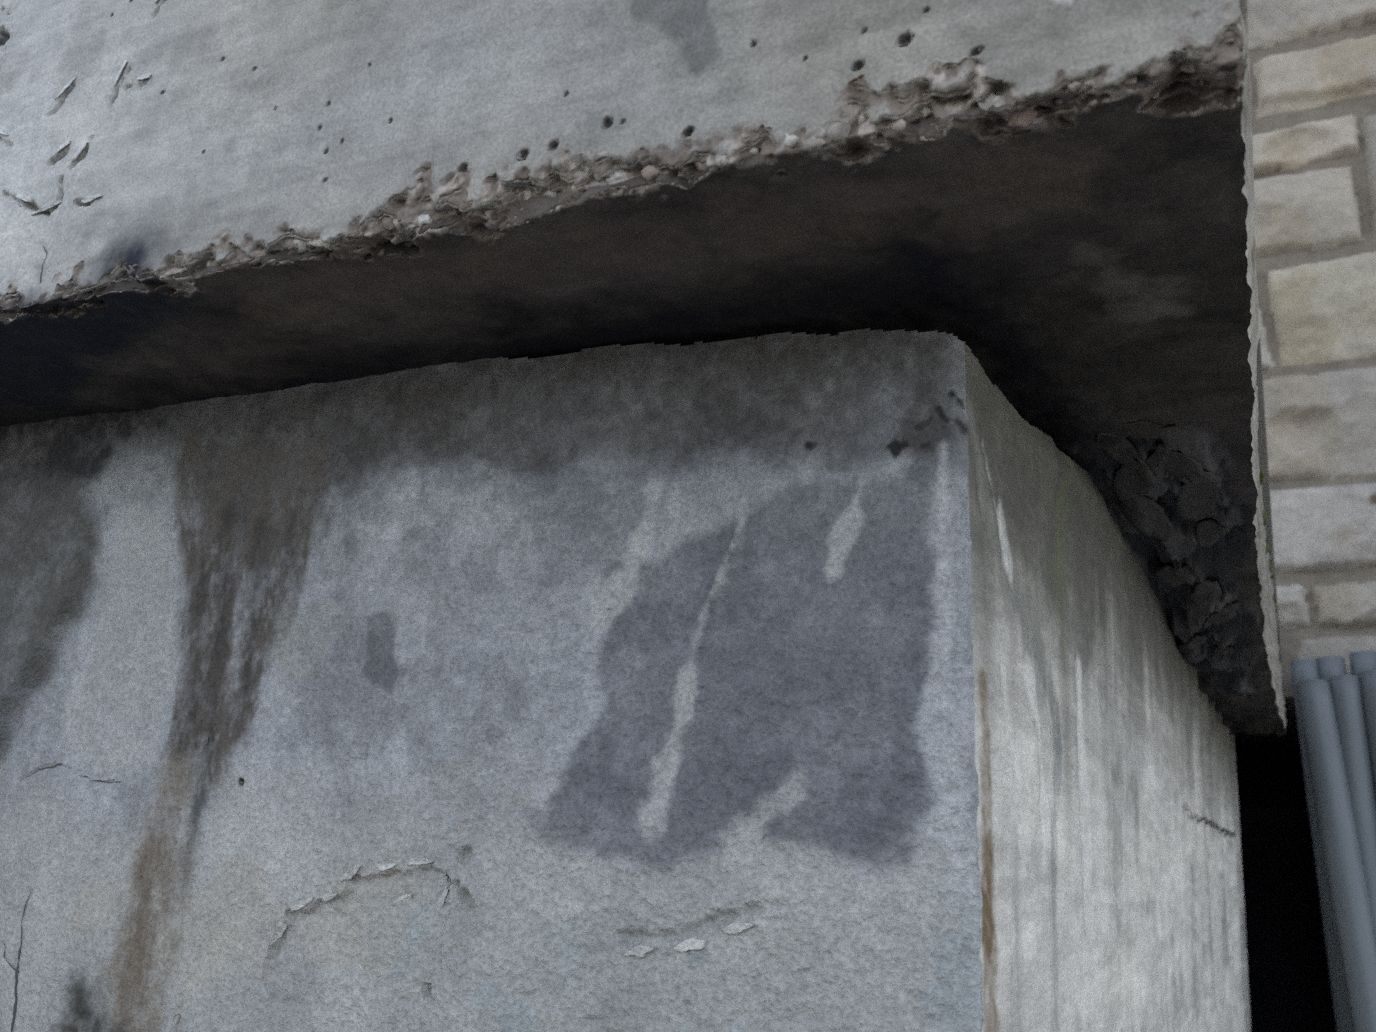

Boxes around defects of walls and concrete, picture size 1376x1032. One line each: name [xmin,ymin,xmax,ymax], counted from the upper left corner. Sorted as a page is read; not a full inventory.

spalling [0,0,1245,324]
leakage [626,0,729,86]
leakage [0,129,1230,1032]
spalling [1055,422,1264,699]
crack [4,893,31,1032]